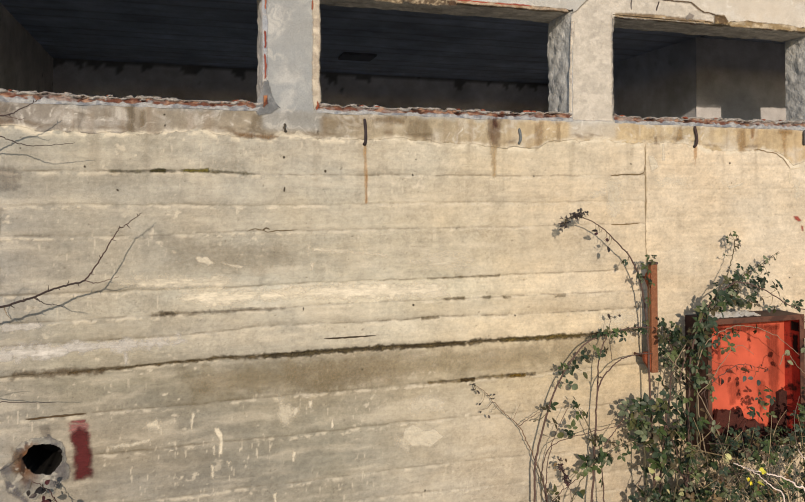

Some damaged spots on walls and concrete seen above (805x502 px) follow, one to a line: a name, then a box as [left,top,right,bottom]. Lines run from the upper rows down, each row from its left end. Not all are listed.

spalling [249,0,280,115]
spalling [312,0,331,110]
spalling [376,0,805,121]
leakage [491,119,499,176]
crack [611,150,647,251]
crack [755,149,799,183]